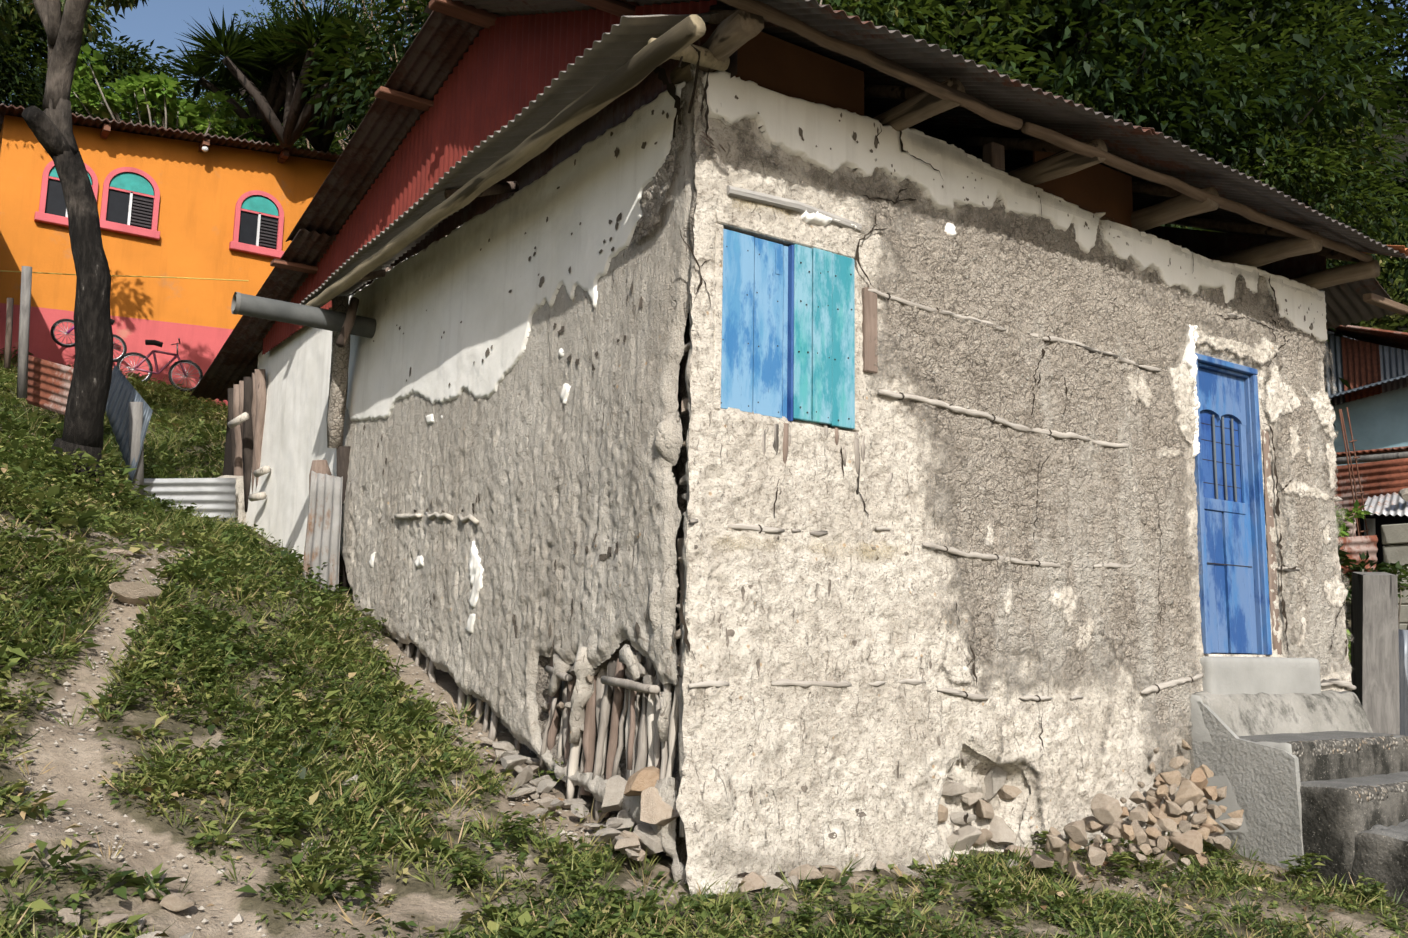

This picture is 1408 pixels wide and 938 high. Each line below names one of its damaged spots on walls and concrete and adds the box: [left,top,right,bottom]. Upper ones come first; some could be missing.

crack [680,230,712,306]
crack [856,126,944,287]
spalling [346,71,1370,861]
crack [1264,423,1297,651]
crack [676,591,695,658]